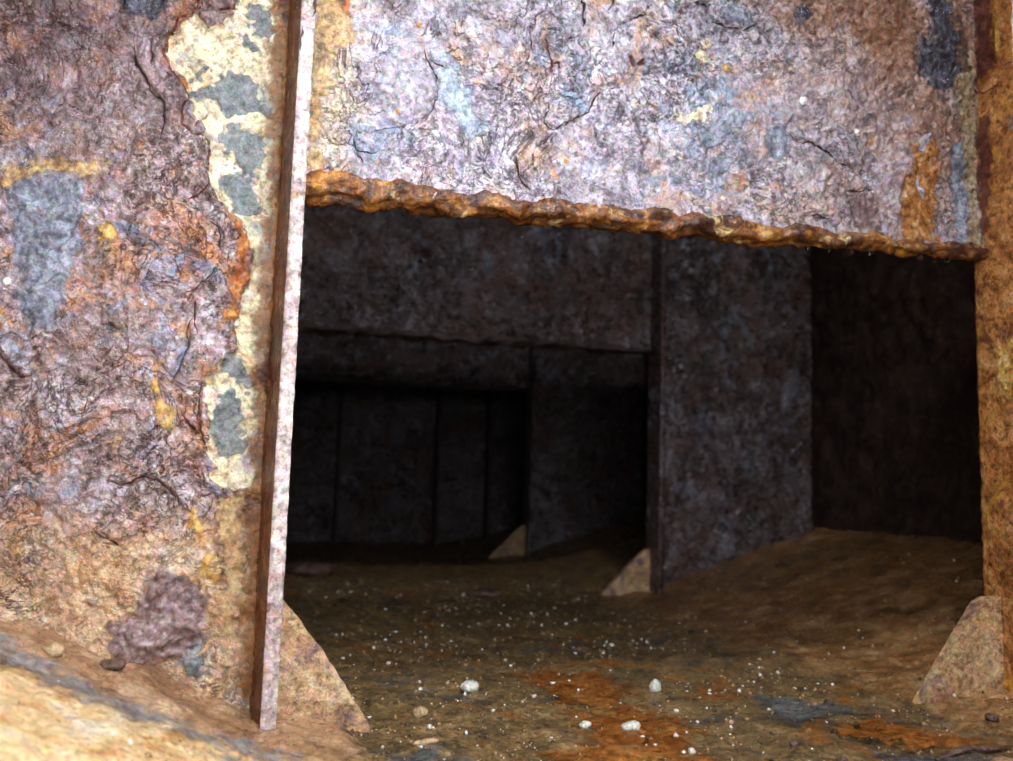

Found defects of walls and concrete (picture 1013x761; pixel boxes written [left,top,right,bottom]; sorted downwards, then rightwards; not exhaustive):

crack [530,0,645,74]
rust [973,0,1002,78]
crack [133,0,236,199]
crack [414,50,444,125]
crack [543,91,601,144]
crack [789,133,873,219]
rust [900,133,941,243]
rust [975,115,992,235]
crack [173,219,221,380]
peeling [165,0,289,644]
rust [996,339,1013,398]
crack [184,383,207,450]